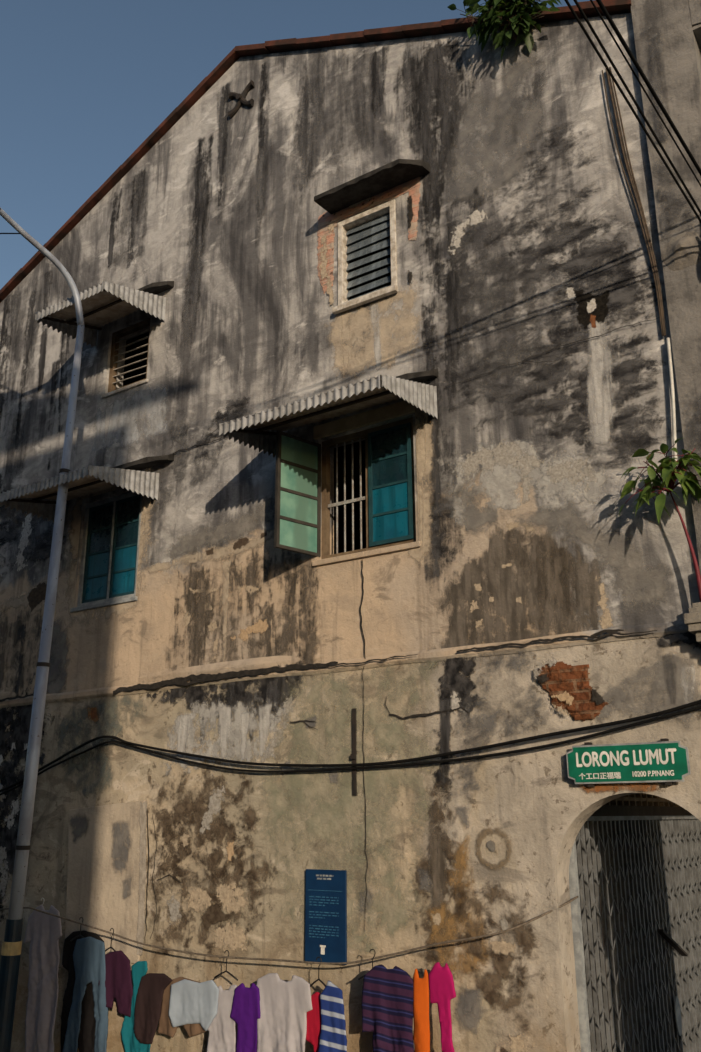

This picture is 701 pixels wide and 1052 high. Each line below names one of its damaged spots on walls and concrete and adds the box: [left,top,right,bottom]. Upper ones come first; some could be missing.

leakage [108,170,147,268]
leakage [182,83,232,346]
leakage [255,65,269,243]
flaking render [317,177,421,306]
spalling [566,287,609,329]
leakage [0,271,70,573]
peeling [148,530,274,573]
leakage [292,39,663,1032]
leakage [0,550,318,955]
flaking render [533,658,609,721]
leakage [598,654,701,724]